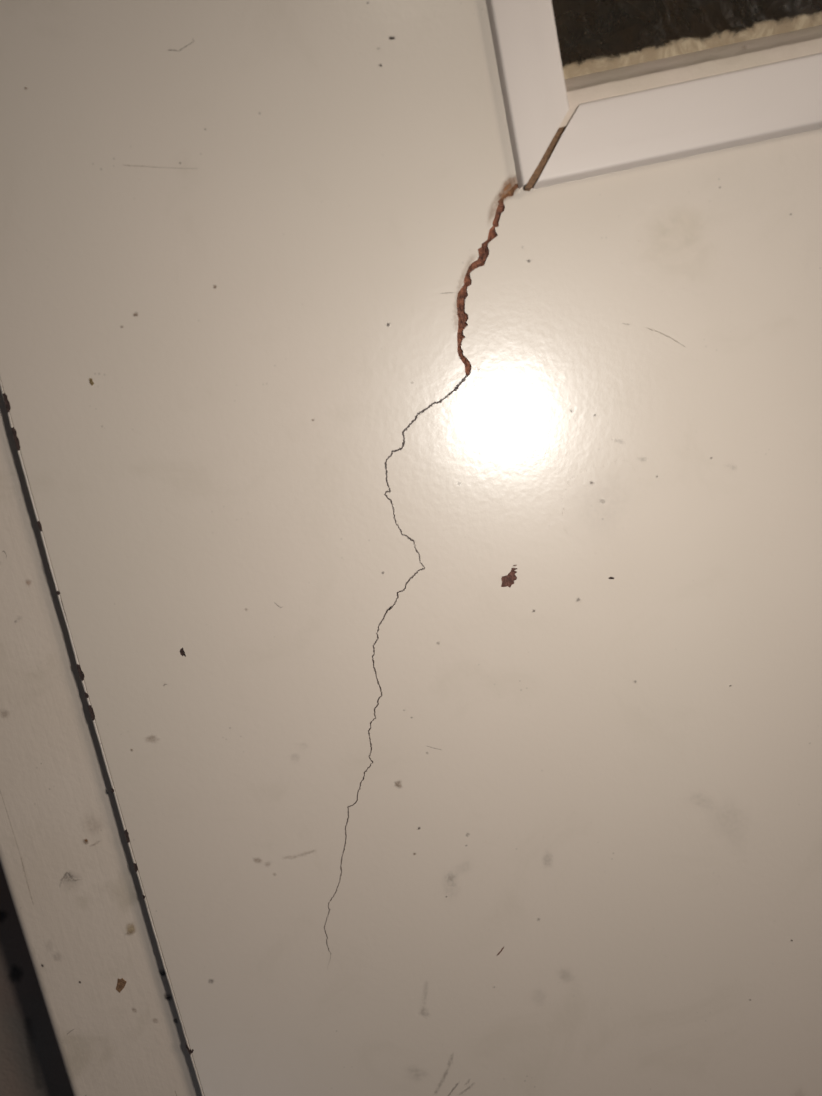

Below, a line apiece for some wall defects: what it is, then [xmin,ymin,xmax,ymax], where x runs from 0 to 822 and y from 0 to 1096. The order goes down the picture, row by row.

crack [324,184,518,950]